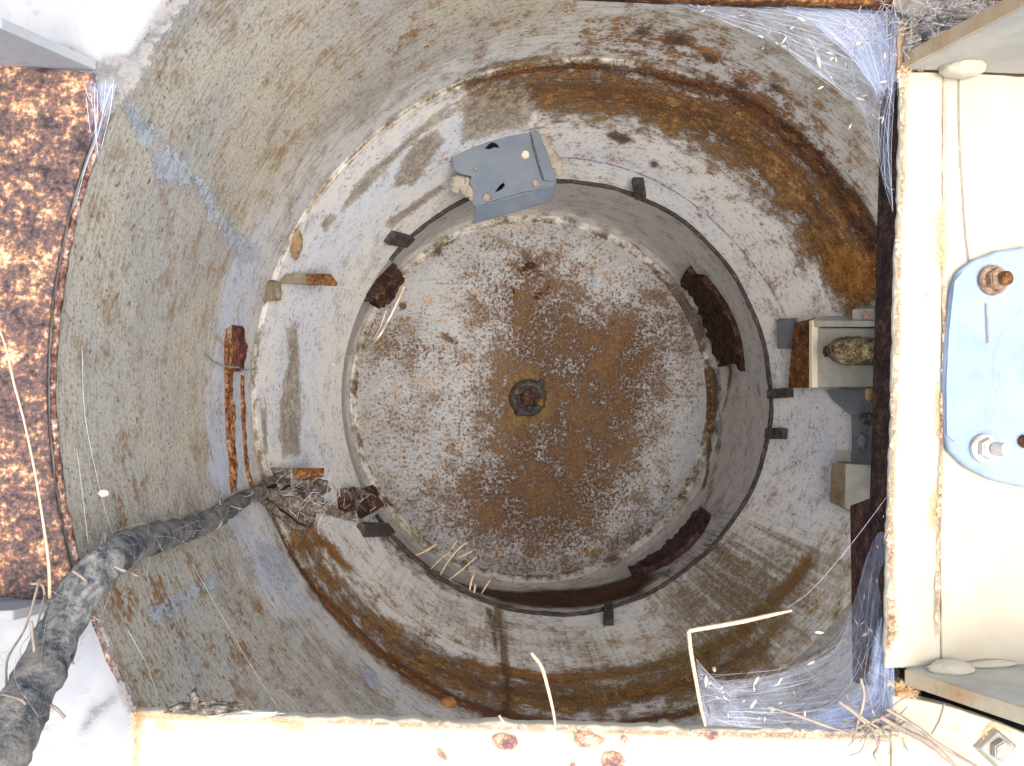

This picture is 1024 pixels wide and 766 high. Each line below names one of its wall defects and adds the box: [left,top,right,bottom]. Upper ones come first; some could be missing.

corrosion [455,47,877,316]
corrosion [224,324,255,493]
corrosion [355,224,732,608]
corrosion [130,513,893,766]